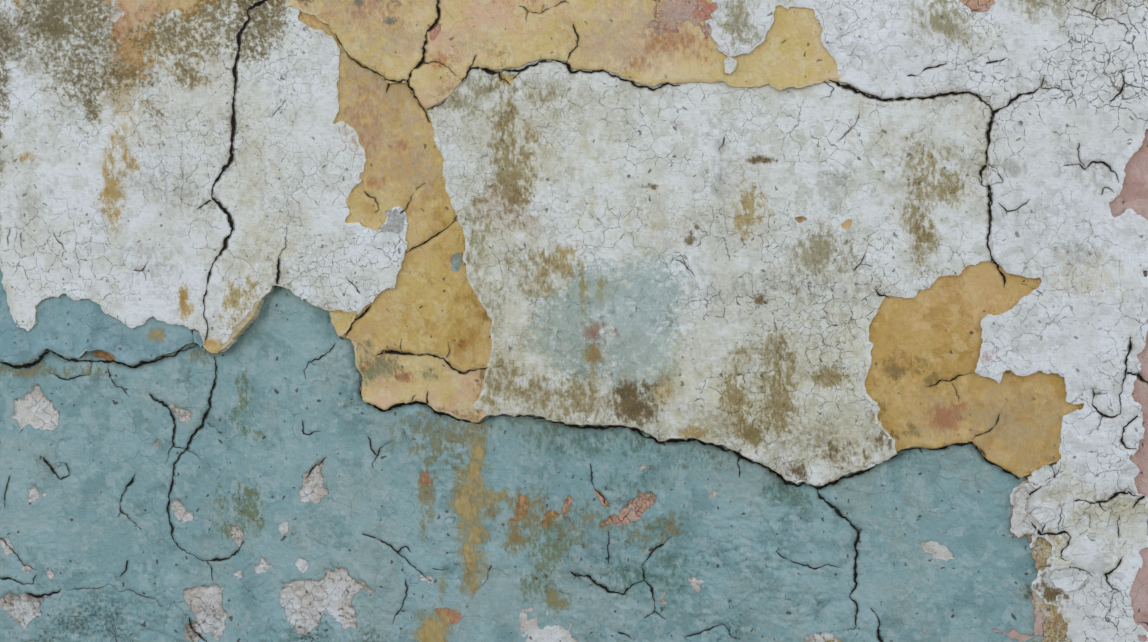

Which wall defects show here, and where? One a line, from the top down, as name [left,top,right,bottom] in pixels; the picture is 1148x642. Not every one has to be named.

crack [326,0,680,123]
crack [0,0,266,581]
peeling [0,0,848,423]
peeling [428,0,1148,642]
crack [820,63,1070,298]
spalling [11,384,60,431]
crack [0,538,207,642]
spalling [183,584,228,642]
spalling [279,557,375,634]
corrosion [417,611,453,642]
corrosion [453,423,499,590]
crack [358,337,1148,642]